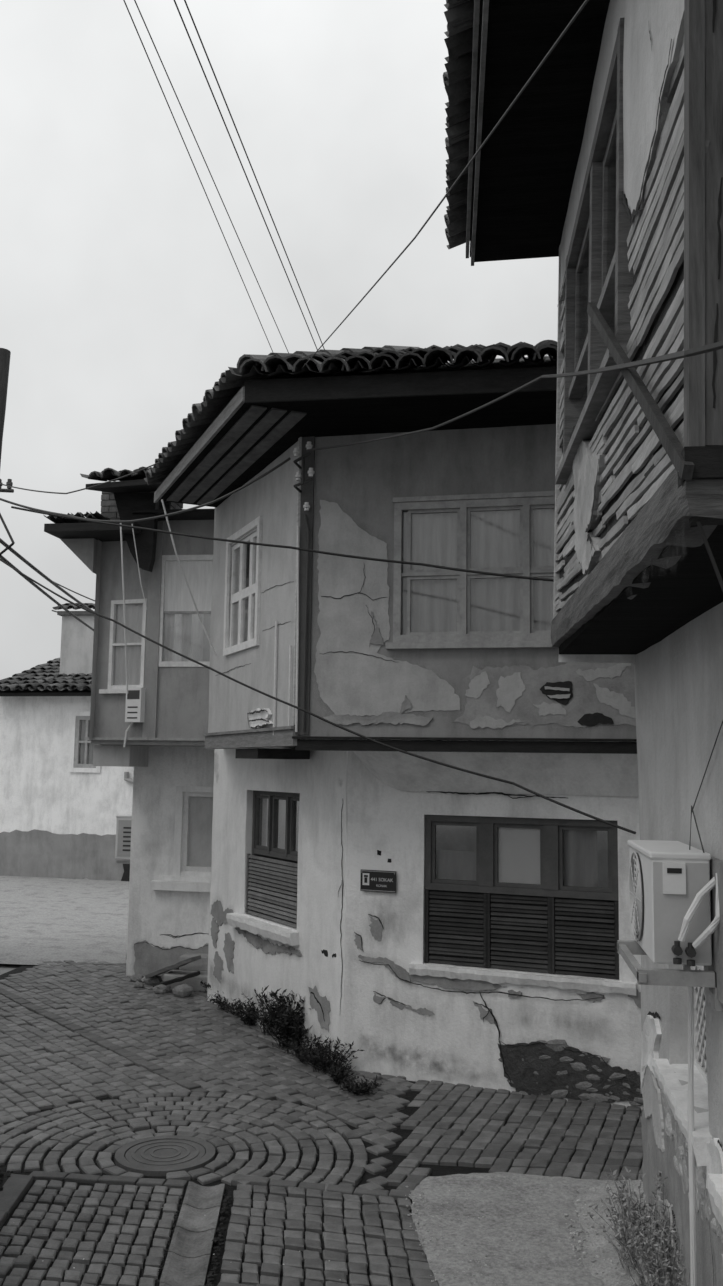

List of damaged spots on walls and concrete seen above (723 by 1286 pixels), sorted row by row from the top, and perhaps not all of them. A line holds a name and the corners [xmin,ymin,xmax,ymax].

spalling [622,39,672,224]
peeling [584,459,599,577]
crack [320,565,394,662]
peeling [314,500,636,729]
flaking render [134,900,302,983]
spalling [354,914,605,1027]
crack [480,993,608,1084]
flaking render [628,989,723,1286]